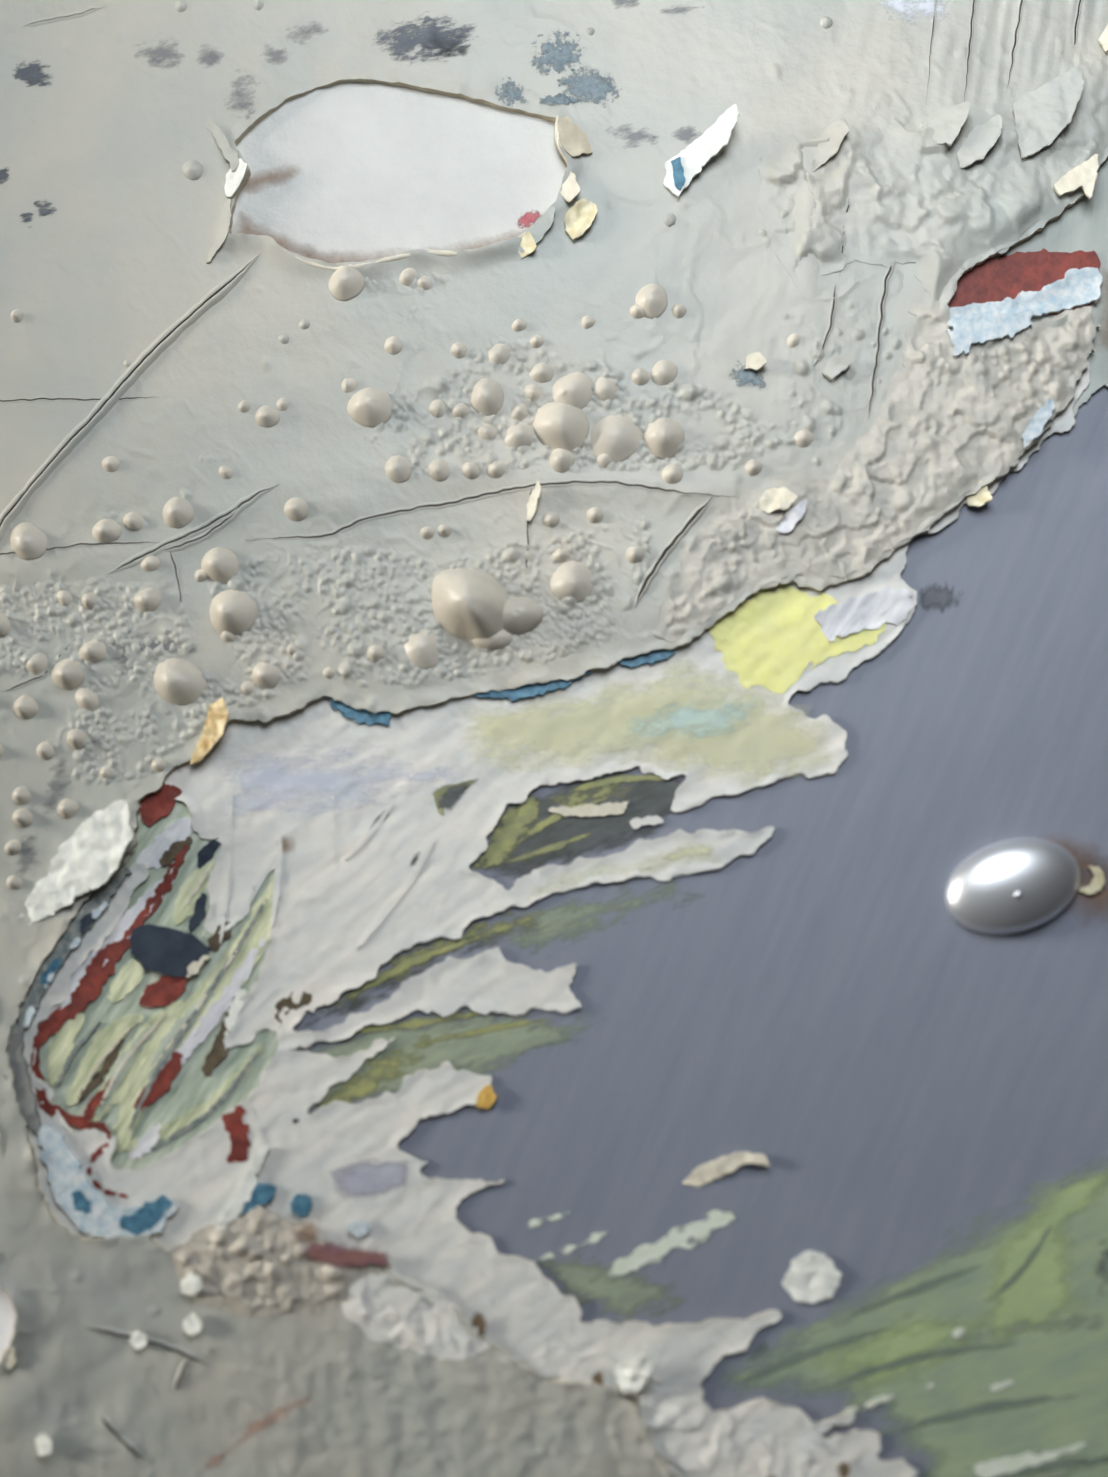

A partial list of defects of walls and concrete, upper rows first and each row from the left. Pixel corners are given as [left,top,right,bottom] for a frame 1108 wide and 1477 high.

peeling [205,82,597,270]
peeling [654,23,1108,643]
crack [0,254,739,609]
peeling [527,480,541,521]
crack [1,639,75,692]
peeling [1078,866,1105,895]
peeling [6,540,918,1477]
peeling [0,1287,17,1369]